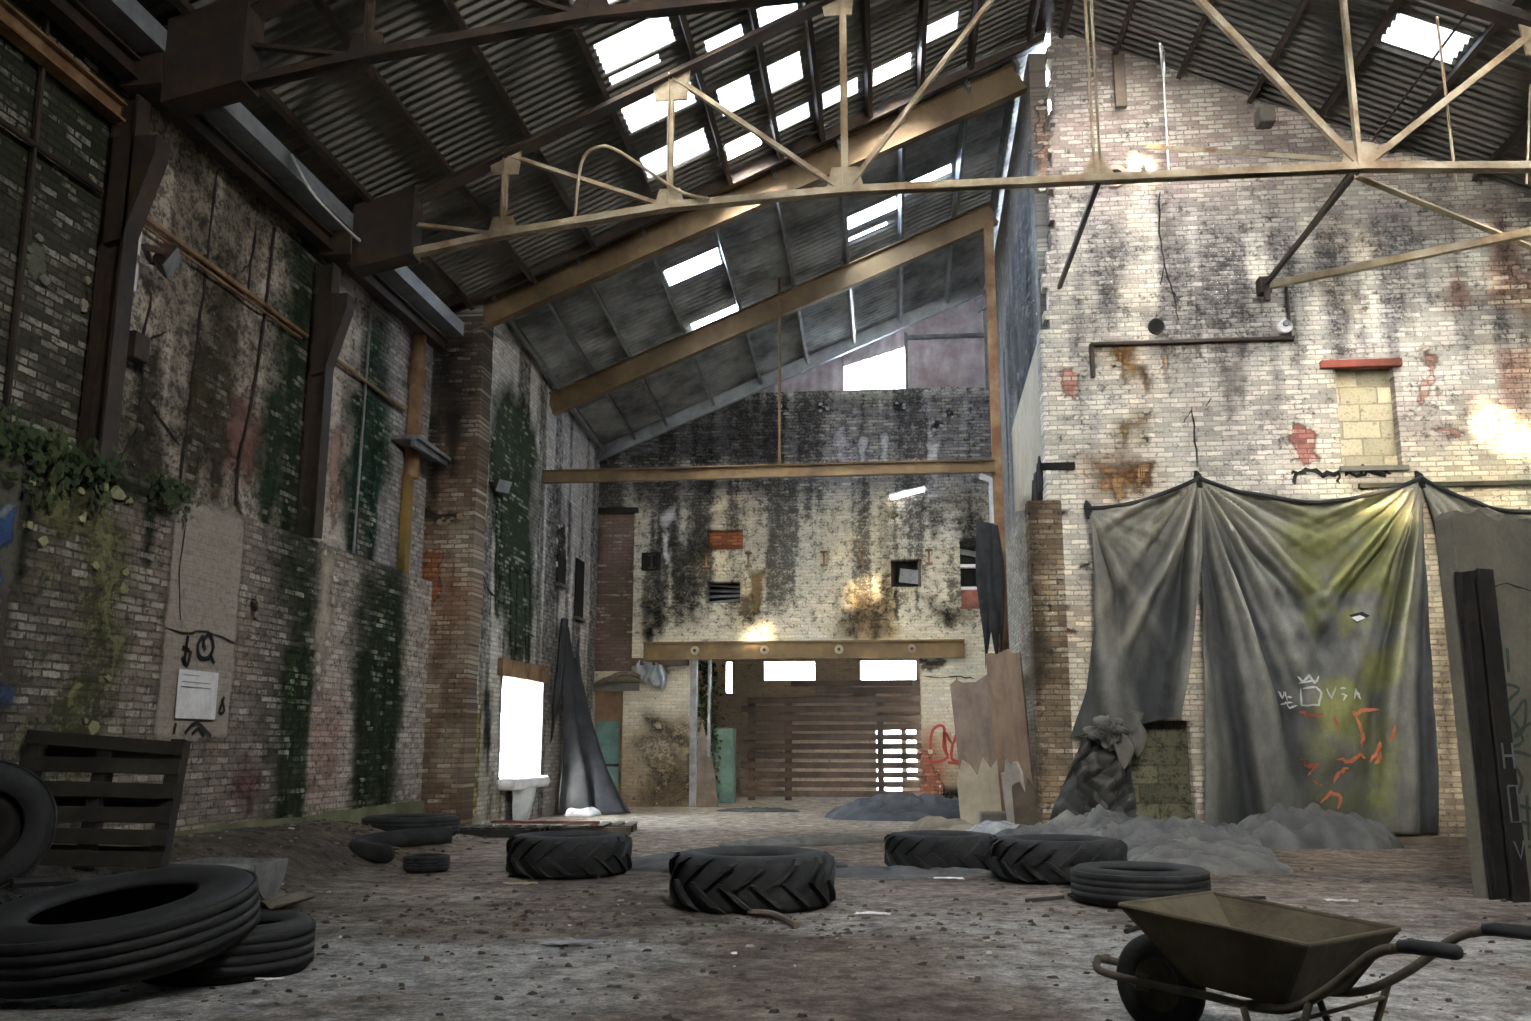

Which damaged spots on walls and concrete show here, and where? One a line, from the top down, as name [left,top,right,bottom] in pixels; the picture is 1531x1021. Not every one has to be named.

rust [1109,346,1149,391]
water stain [0,253,240,576]
water stain [262,357,304,530]
water stain [833,427,888,462]
water stain [926,442,940,460]
rust [1091,416,1152,502]
peeling [1286,423,1322,465]
water stain [634,456,695,642]
water stain [841,576,897,640]
water stain [916,587,968,628]